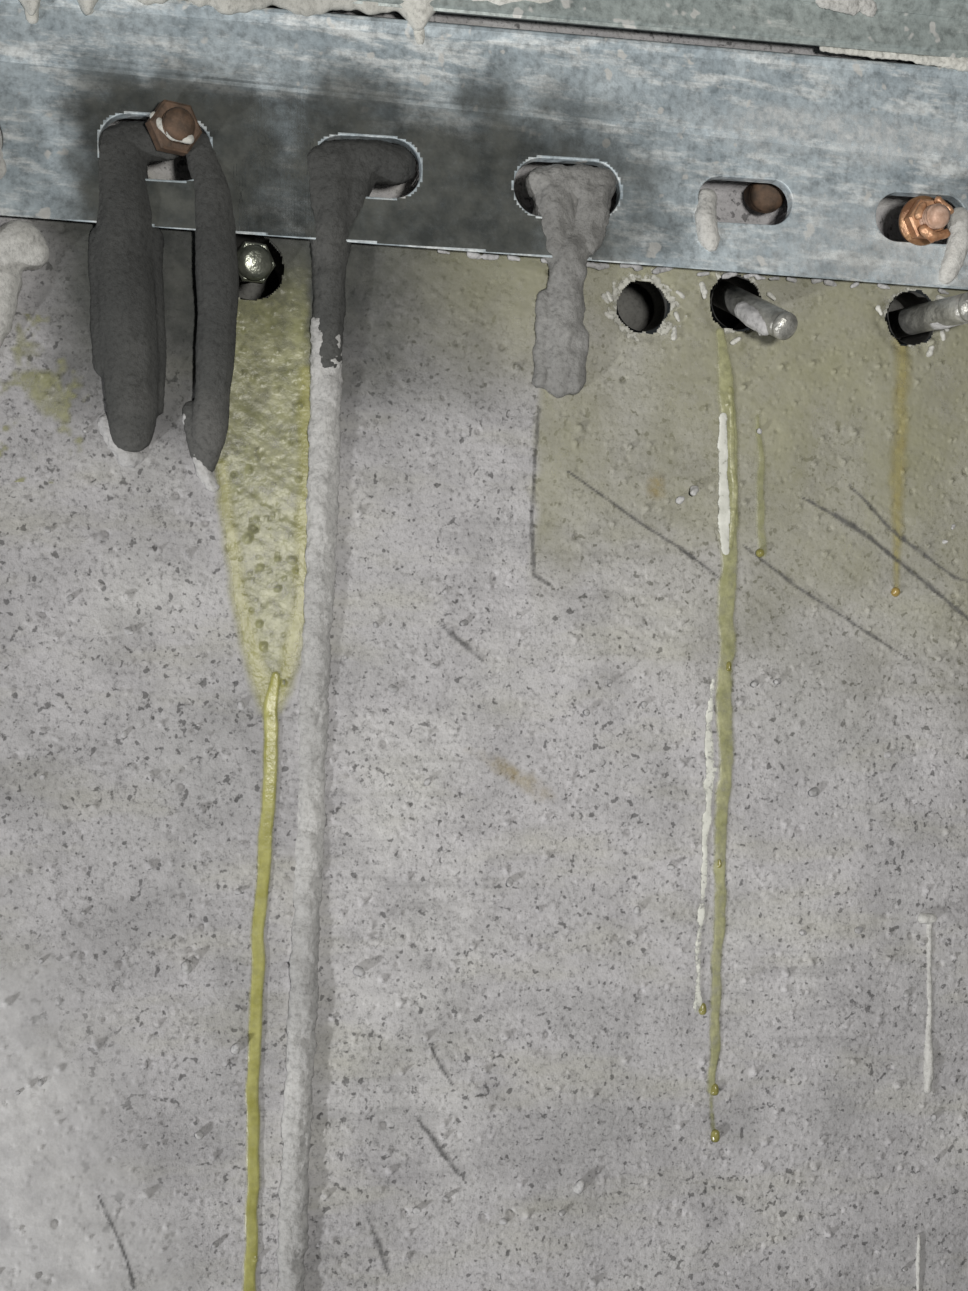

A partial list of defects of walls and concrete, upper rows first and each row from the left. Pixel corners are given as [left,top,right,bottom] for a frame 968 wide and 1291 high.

leakage [54,220,96,361]
leakage [159,228,198,385]
leakage [342,243,454,379]
leakage [484,253,549,315]
rust [914,196,954,243]
leakage [217,235,314,1291]
leakage [611,262,968,1143]